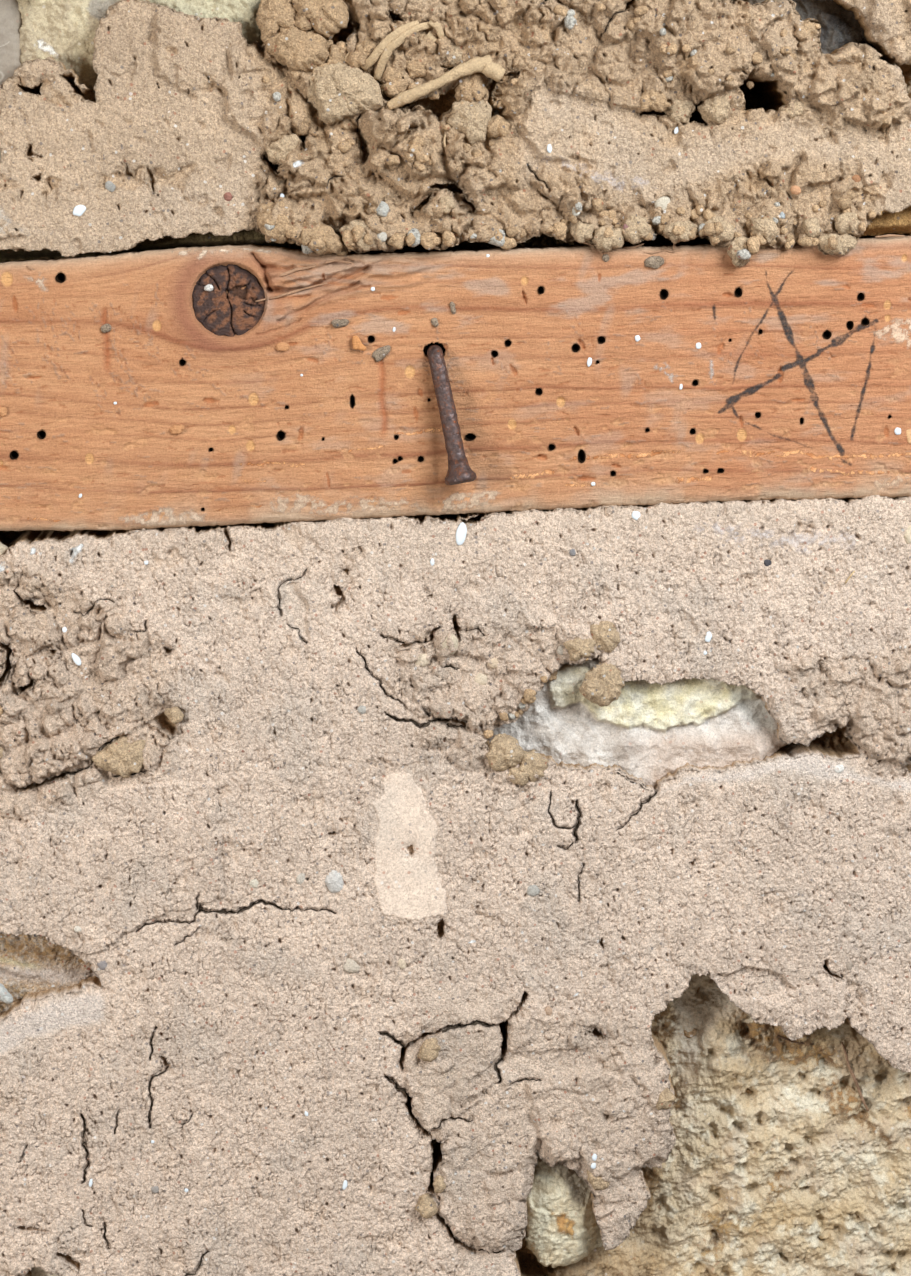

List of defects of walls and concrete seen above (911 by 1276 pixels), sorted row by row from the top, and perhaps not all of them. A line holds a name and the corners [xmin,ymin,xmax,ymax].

spalling [896,0,911,65]
spalling [246,0,883,268]
crack [136,894,336,946]
crack [380,1032,405,1048]
crack [442,1021,495,1033]
crack [494,1057,542,1084]
crack [386,1076,408,1096]